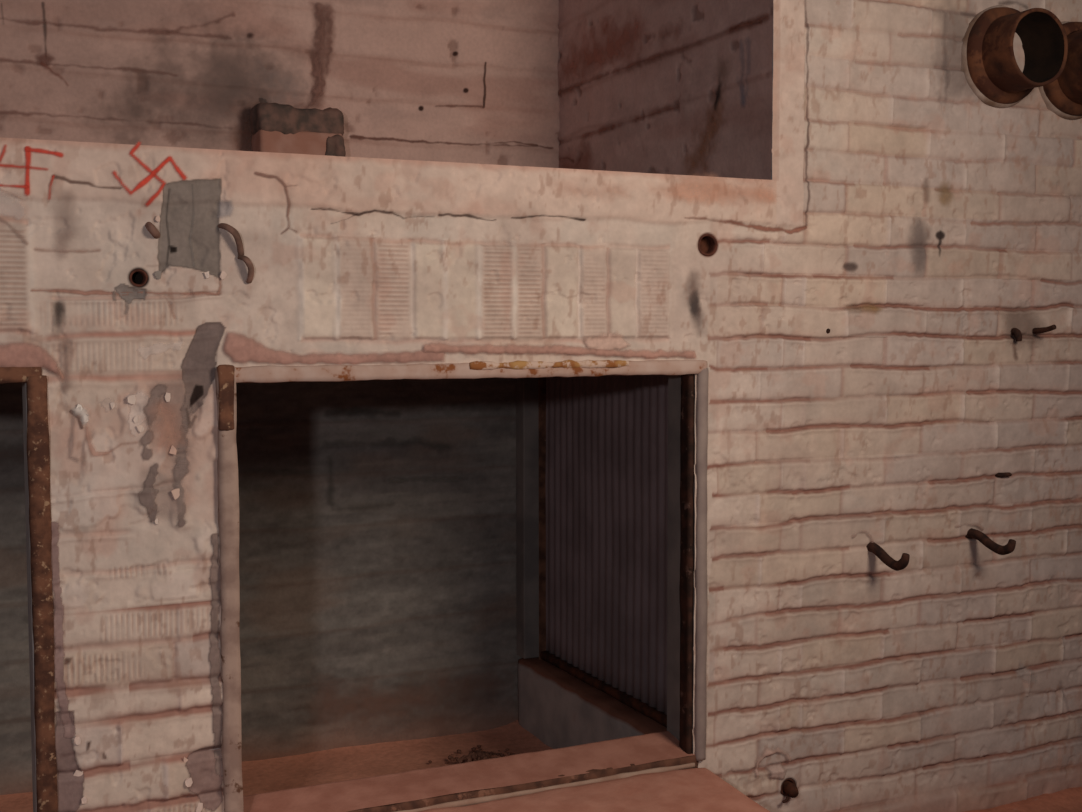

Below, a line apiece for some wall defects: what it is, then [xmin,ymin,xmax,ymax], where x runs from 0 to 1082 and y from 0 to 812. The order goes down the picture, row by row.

crack [255,172,297,232]
crack [322,208,399,216]
crack [439,212,477,220]
corrosion [469,360,629,370]
flaking render [102,322,226,527]
flaking render [183,533,223,812]